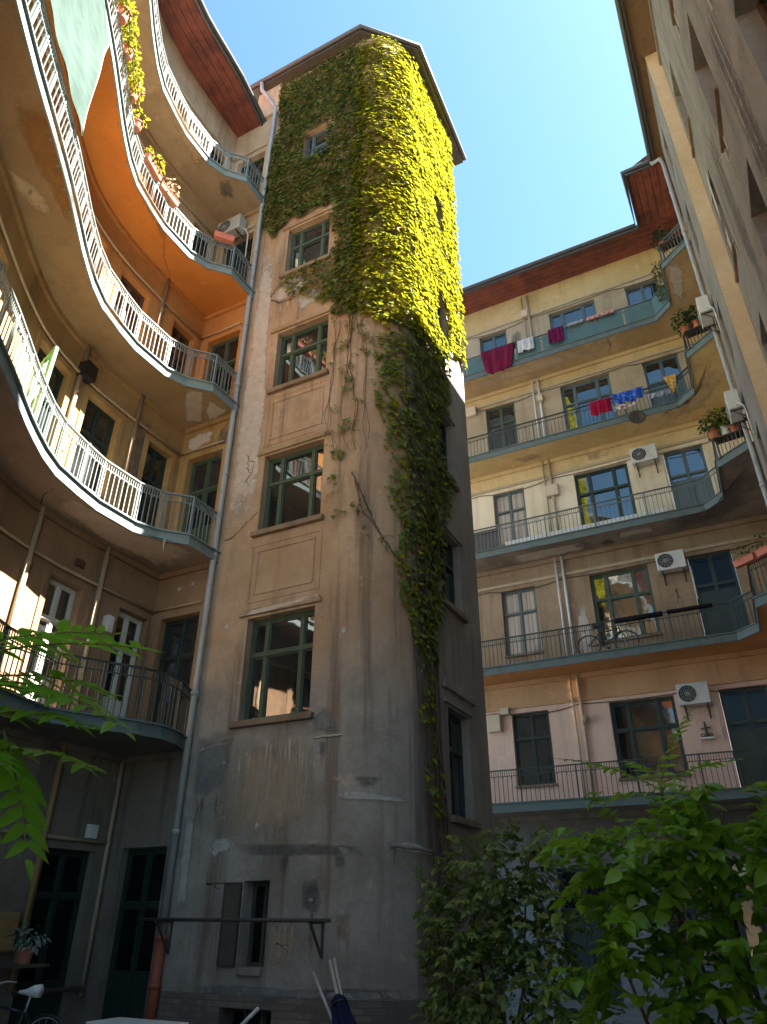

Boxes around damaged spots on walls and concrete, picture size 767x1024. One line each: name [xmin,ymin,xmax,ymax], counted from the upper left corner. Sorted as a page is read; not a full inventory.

peeling [668,265,695,300]
peeling [188,401,225,450]